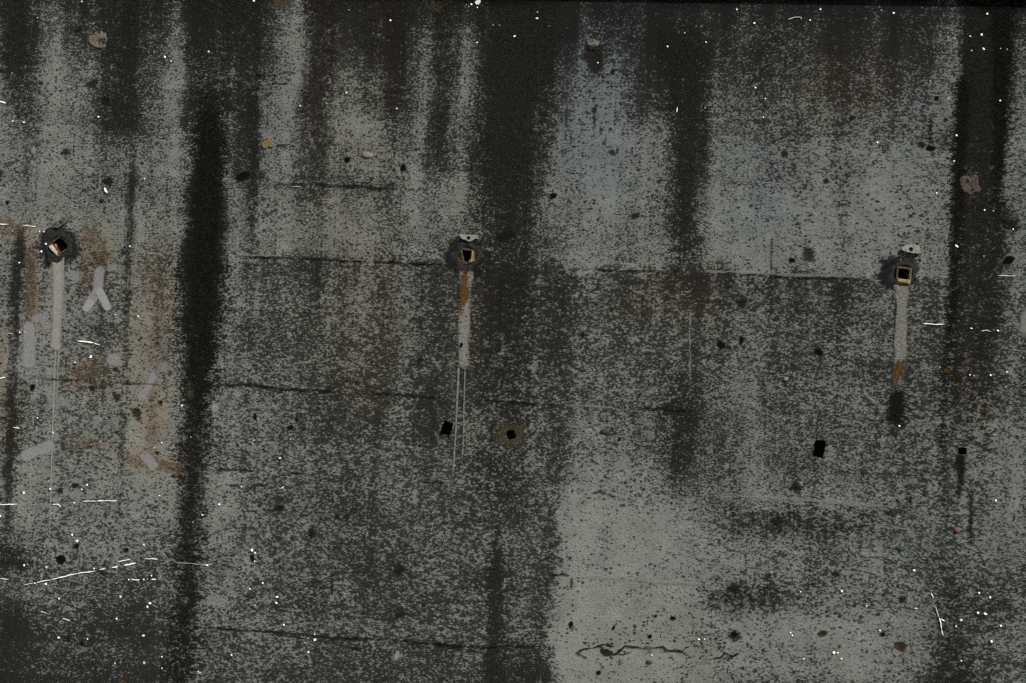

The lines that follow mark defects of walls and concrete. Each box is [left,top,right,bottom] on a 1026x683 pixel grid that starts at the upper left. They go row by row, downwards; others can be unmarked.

damp [162,0,276,683]
damp [430,0,564,512]
damp [663,386,693,477]
damp [655,24,713,268]
damp [937,0,1016,545]
crack [207,626,541,652]
damp [482,526,506,683]
crack [575,644,690,659]